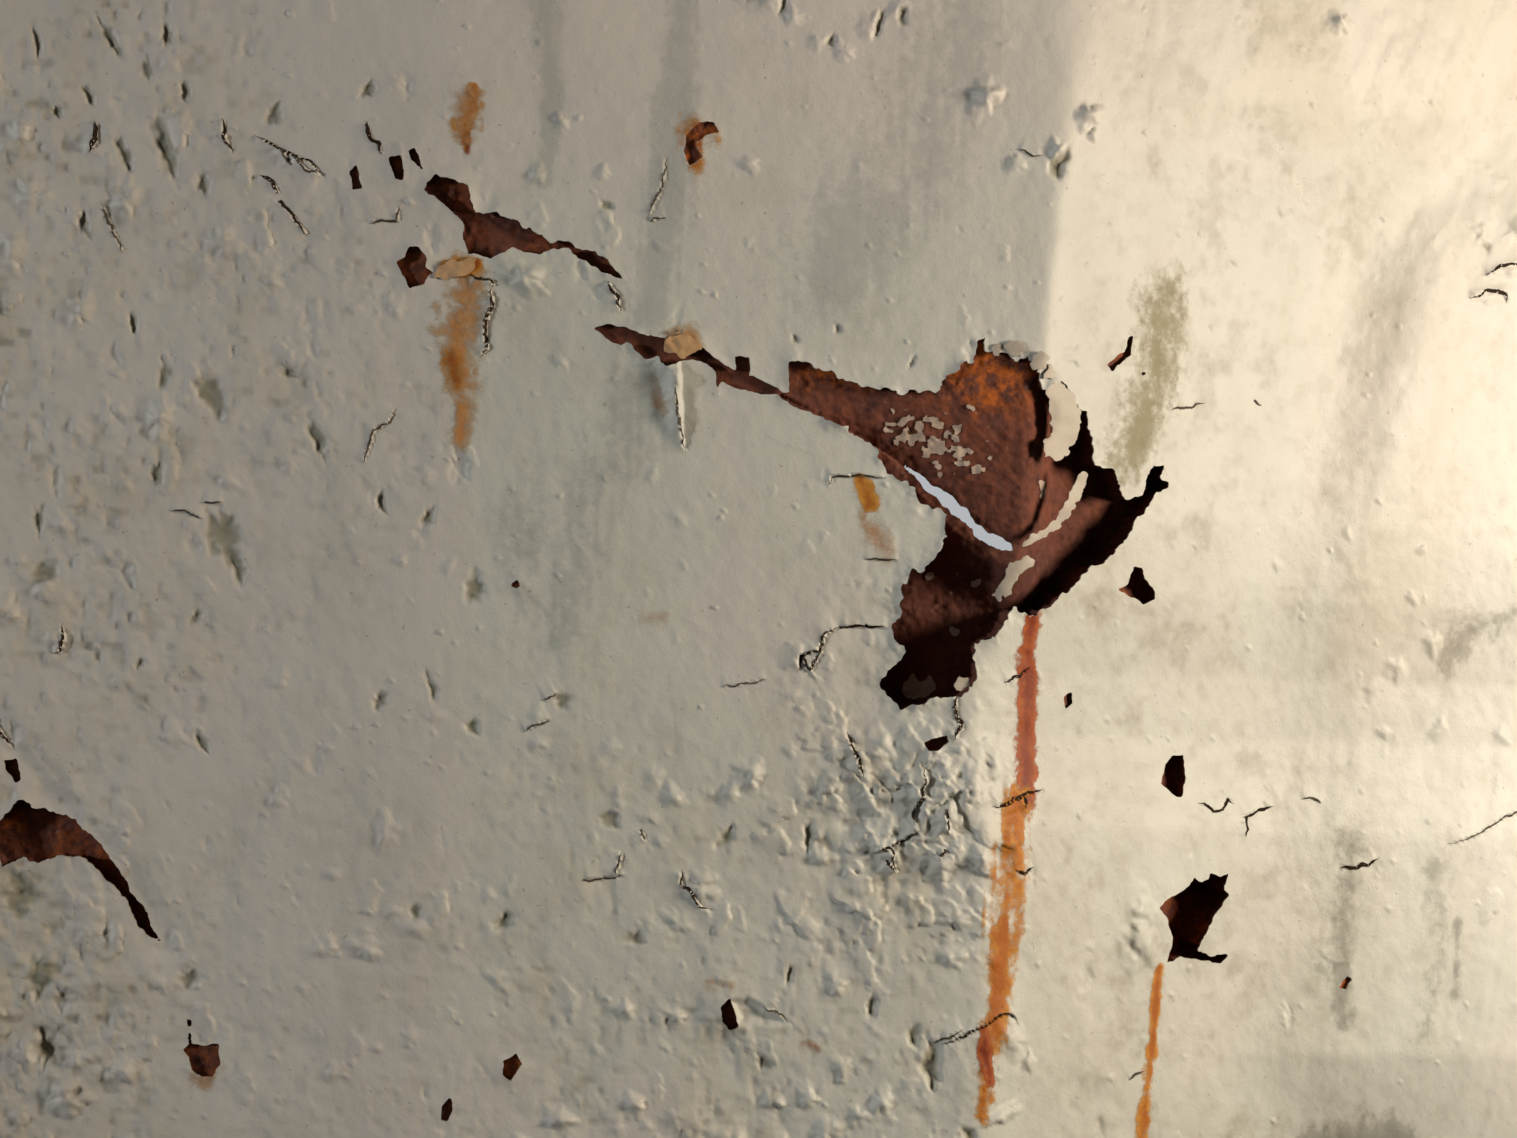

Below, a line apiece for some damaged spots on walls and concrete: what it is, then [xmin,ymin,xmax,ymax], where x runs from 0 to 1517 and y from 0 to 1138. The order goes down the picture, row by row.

corrosion [450,82,484,154]
corrosion [430,255,486,449]
peeling [992,340,1081,462]
peeling [883,405,992,477]
peeling [971,471,1088,602]
peeling [1119,567,1154,604]
crack [723,624,884,688]
peeling [1161,755,1185,797]
crack [1444,811,1517,848]
corrosion [975,611,1042,1125]
peeling [183,1020,220,1076]
corrosion [1136,963,1163,1138]